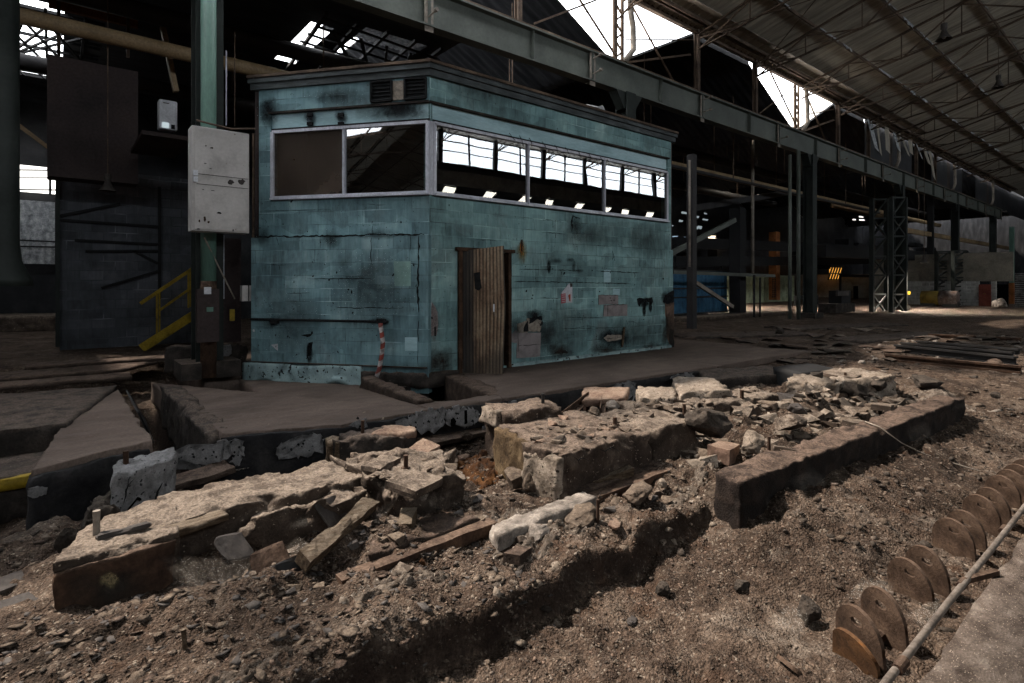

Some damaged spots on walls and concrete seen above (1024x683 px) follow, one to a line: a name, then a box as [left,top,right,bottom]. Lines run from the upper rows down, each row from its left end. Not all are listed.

crack [255,204,424,362]
peeling [175,438,245,470]
peeling [276,432,325,460]